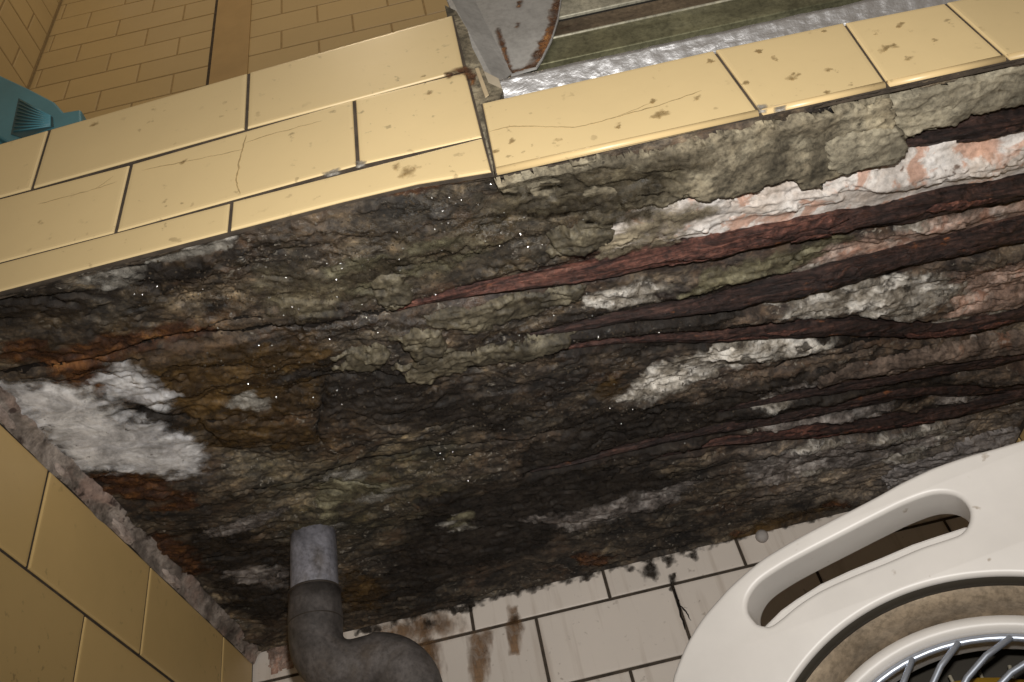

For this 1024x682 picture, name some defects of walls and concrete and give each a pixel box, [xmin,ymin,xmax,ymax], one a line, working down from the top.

peeling [237,65,1024,472]
damp [0,368,206,480]
corrosion [38,322,212,394]
peeling [0,386,294,675]
damp [314,470,402,527]
damp [273,351,525,435]
damp [378,273,994,603]
peeling [881,426,1020,490]
corrosion [470,631,491,682]
corrosion [507,607,522,654]
damp [355,548,697,636]
crack [670,580,690,629]